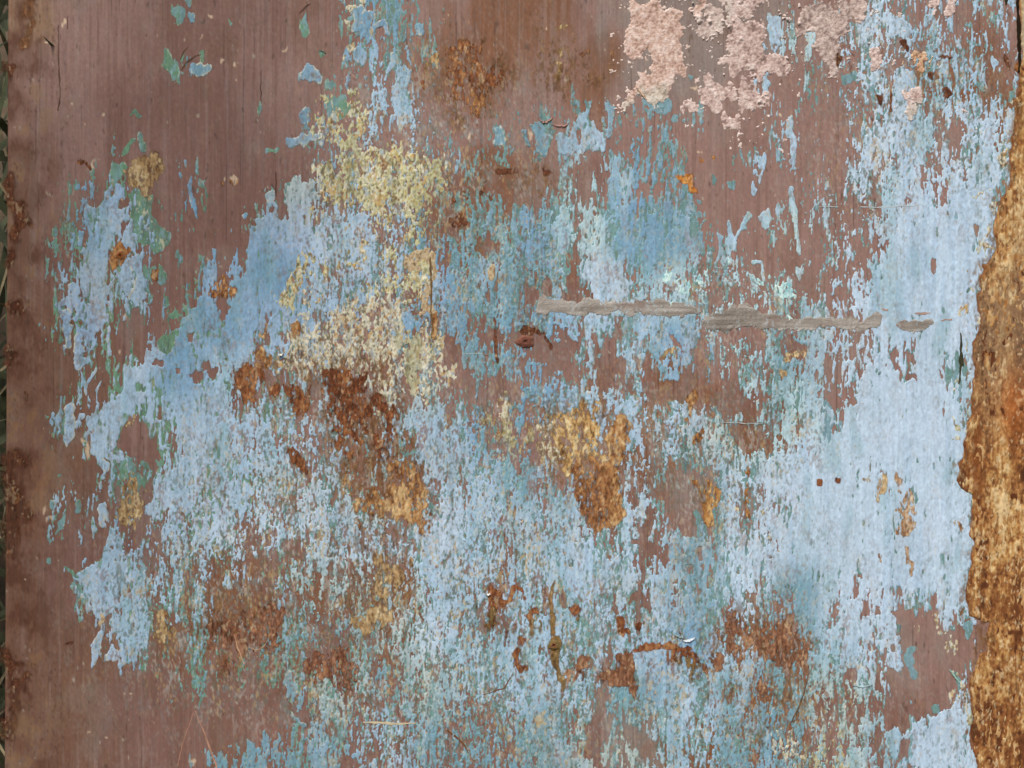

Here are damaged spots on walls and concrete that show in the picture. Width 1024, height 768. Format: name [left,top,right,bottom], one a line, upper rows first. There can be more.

peeling [161,48,212,84]
peeling [174,157,208,222]
peeling [732,146,767,197]
peeling [758,186,806,256]
rust [235,321,432,534]
rust [551,400,633,534]
rust [954,0,1024,768]
peeling [47,485,69,545]
rust [863,472,917,576]
rust [485,581,591,693]
rust [599,612,810,701]
peeling [201,748,228,768]